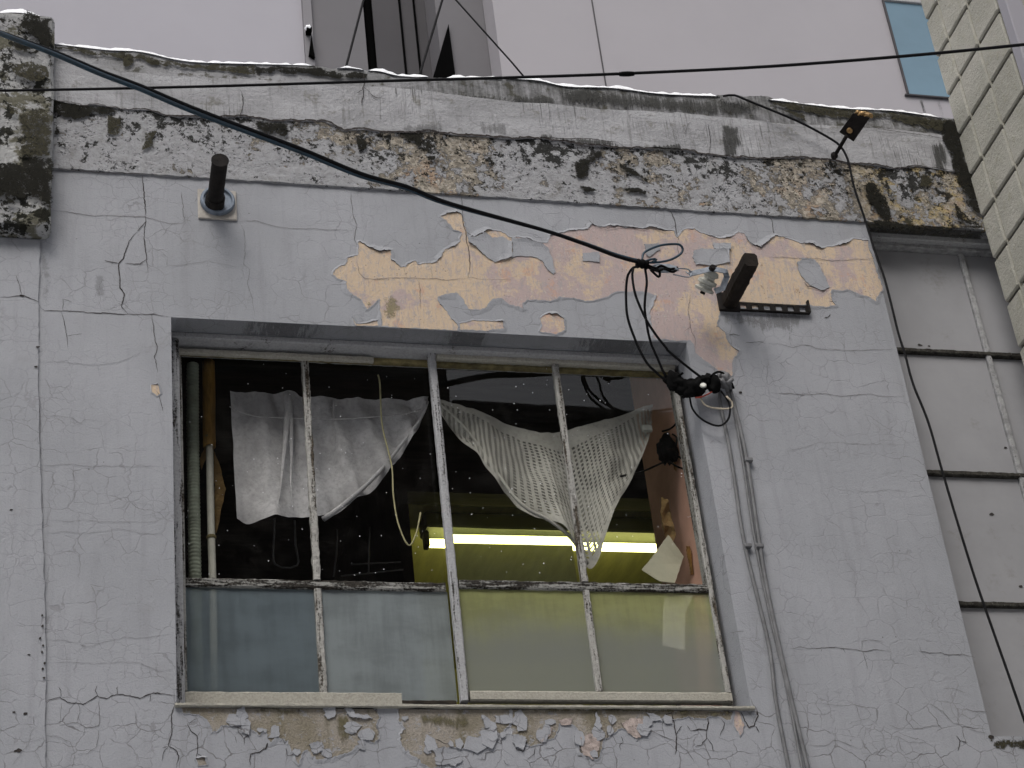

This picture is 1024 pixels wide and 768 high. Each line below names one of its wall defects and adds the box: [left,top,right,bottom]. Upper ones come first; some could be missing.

leakage [8,11,54,66]
leakage [54,101,117,147]
leakage [454,89,759,156]
leakage [0,157,54,223]
leakage [541,135,616,192]
leakage [863,120,985,239]
peeling [331,209,885,378]
crack [39,400,168,546]
crack [17,634,200,767]
peeling [180,707,381,767]
peeling [396,708,745,768]
crack [823,688,987,754]